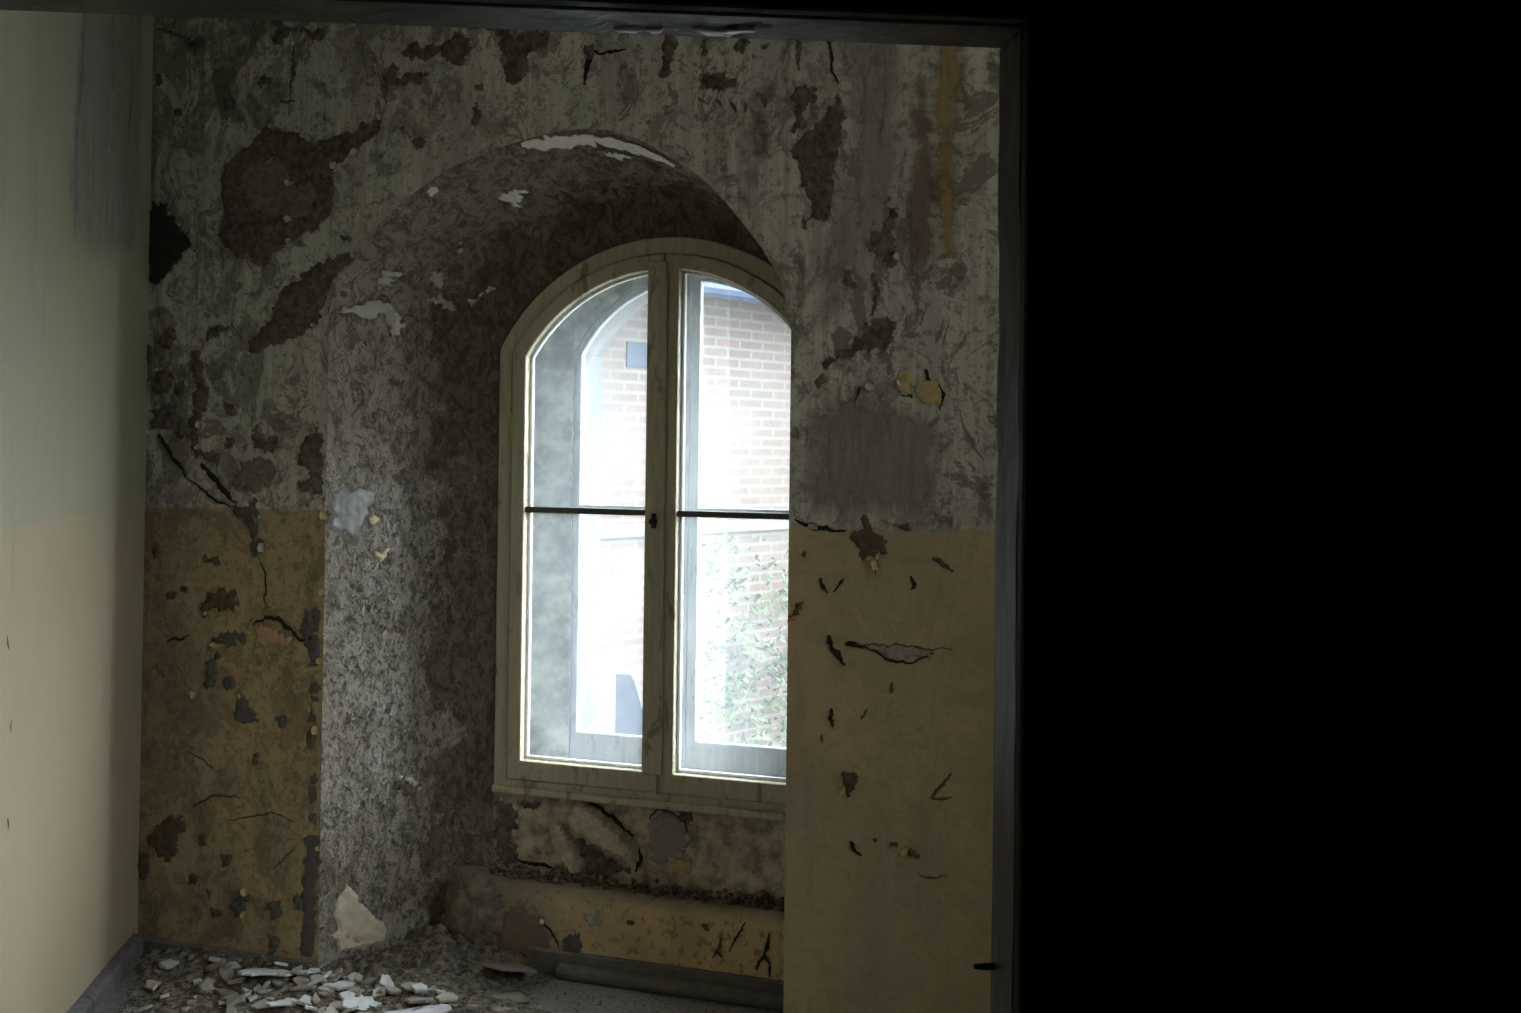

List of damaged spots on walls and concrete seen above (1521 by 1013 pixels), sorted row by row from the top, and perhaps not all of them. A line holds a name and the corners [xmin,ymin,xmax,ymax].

peeling [382,28,550,88]
peeling [614,21,773,113]
peeling [147,195,195,285]
flaking render [212,114,426,278]
flaking render [521,133,675,172]
peeling [788,40,847,229]
peeling [814,197,900,388]
peeling [147,231,409,608]
crack [157,433,237,507]
crack [253,615,312,648]
peeling [185,774,388,962]
flaking render [493,795,693,879]